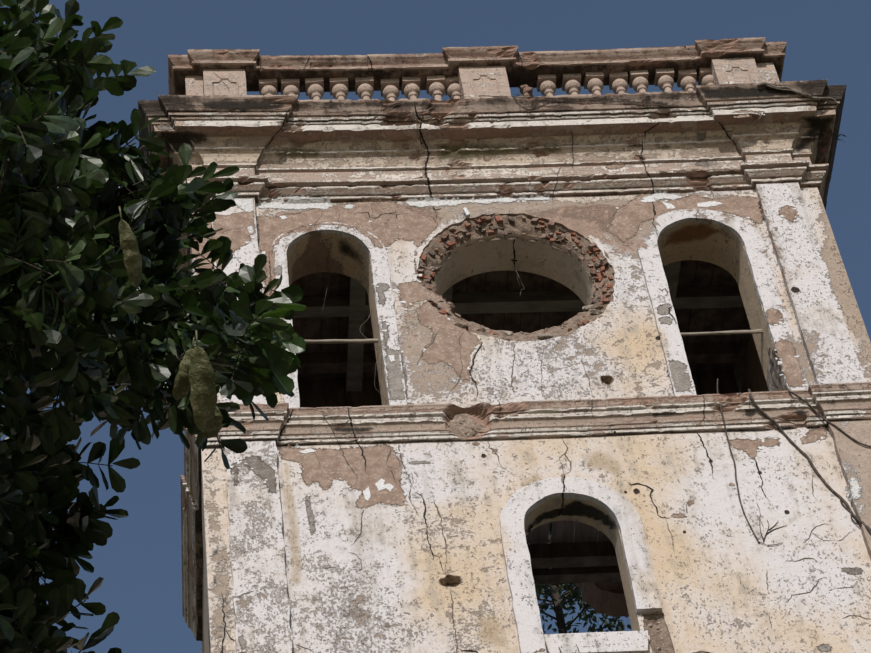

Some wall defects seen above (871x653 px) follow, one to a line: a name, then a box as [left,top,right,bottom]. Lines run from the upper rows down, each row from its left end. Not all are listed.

crack [411,101,442,218]
crack [637,123,659,242]
spalling [192,196,617,380]
crack [449,333,482,401]
peeling [230,455,278,495]
peeling [279,443,430,535]
crack [316,408,478,653]
crack [559,437,571,516]
crack [628,482,688,550]
crack [697,397,714,479]
crack [220,592,249,653]
spalling [643,614,674,653]